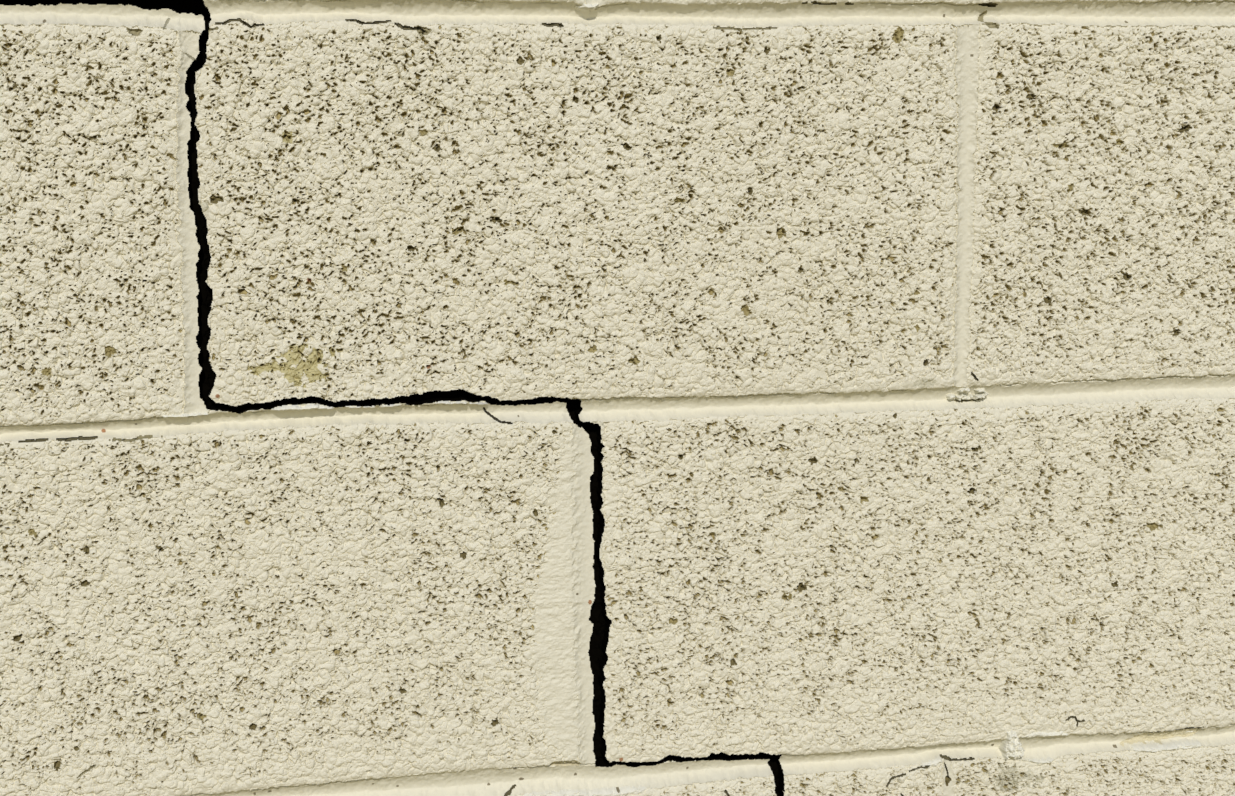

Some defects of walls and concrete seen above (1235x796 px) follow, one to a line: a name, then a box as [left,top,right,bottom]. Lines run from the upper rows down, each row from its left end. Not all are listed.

crack [0,0,785,796]
crack [802,0,854,8]